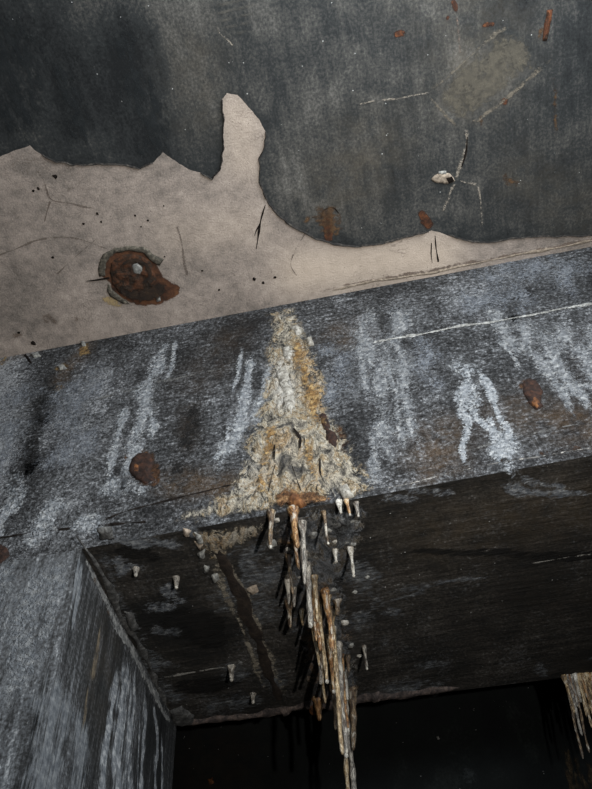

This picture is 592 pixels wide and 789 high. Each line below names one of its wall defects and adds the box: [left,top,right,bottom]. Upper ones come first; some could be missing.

crack [360,93,425,104]
peeling [0,93,592,358]
crack [443,133,483,223]
crack [374,303,592,343]
damp [461,254,592,416]
damp [22,496,74,550]
rust [124,449,160,486]
efflorescence [212,351,274,469]
damp [317,301,444,486]
efflorescence [448,360,521,472]
rust [519,378,543,410]
damp [0,506,460,789]